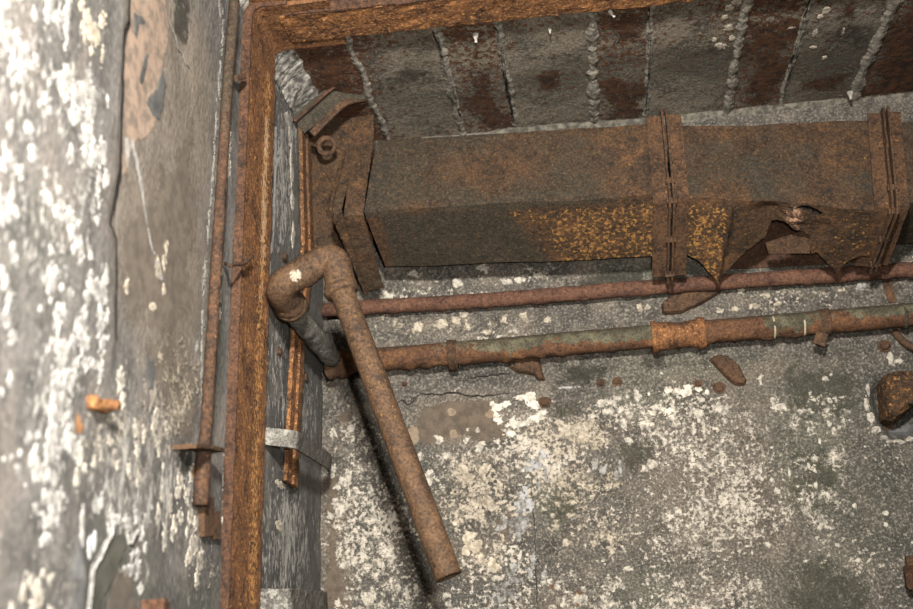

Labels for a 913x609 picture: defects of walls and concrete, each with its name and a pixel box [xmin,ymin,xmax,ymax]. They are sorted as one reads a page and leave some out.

peeling [206,0,225,242]
corrosion [302,48,367,118]
corrosion [464,69,512,129]
corrosion [598,76,646,120]
corrosion [740,15,808,106]
corrosion [792,0,913,98]
peeling [0,0,219,609]
damp [564,363,609,388]
damp [321,410,432,609]
damp [418,384,781,609]
damp [769,389,857,551]